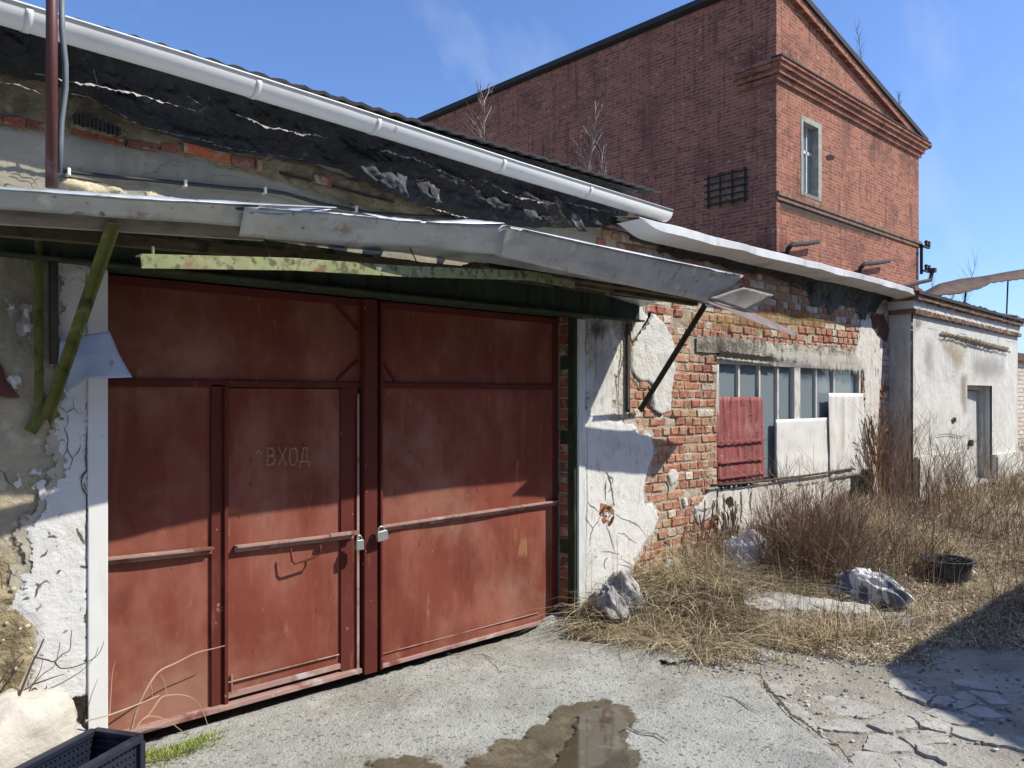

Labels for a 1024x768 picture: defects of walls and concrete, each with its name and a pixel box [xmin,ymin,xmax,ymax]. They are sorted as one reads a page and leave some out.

flaking render [0,71,45,132]
flaking render [58,86,459,222]
spalling [0,364,21,398]
peeling [3,296,34,339]
peeling [58,263,91,345]
crack [3,560,52,597]
peeling [0,380,88,730]
crack [60,403,88,566]
crack [585,429,643,569]
peeling [585,317,662,611]